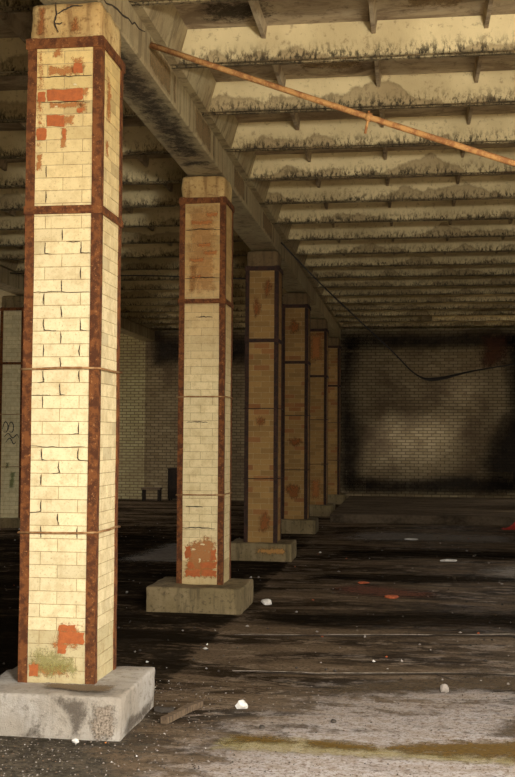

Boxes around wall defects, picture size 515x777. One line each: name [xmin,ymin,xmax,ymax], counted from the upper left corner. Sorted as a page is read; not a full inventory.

crack [54,2,83,32]
crack [104,0,145,32]
peeling [36,48,88,170]
leakage [121,37,214,166]
peeling [183,536,217,578]
peeling [53,623,85,654]
peeling [29,662,69,677]